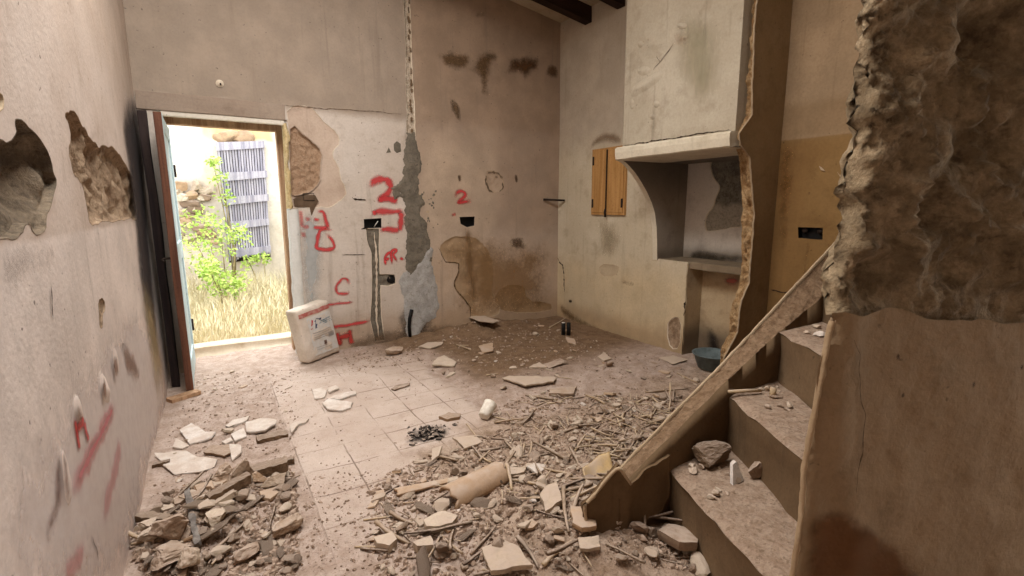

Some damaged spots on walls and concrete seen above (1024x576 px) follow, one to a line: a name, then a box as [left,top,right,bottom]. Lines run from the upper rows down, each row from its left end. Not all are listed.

water stain [443,54,493,86]
water stain [511,58,557,76]
peeling [0,119,57,240]
peeling [65,110,137,226]
peeling [287,106,346,208]
spalling [705,0,758,364]
water stain [467,234,537,300]